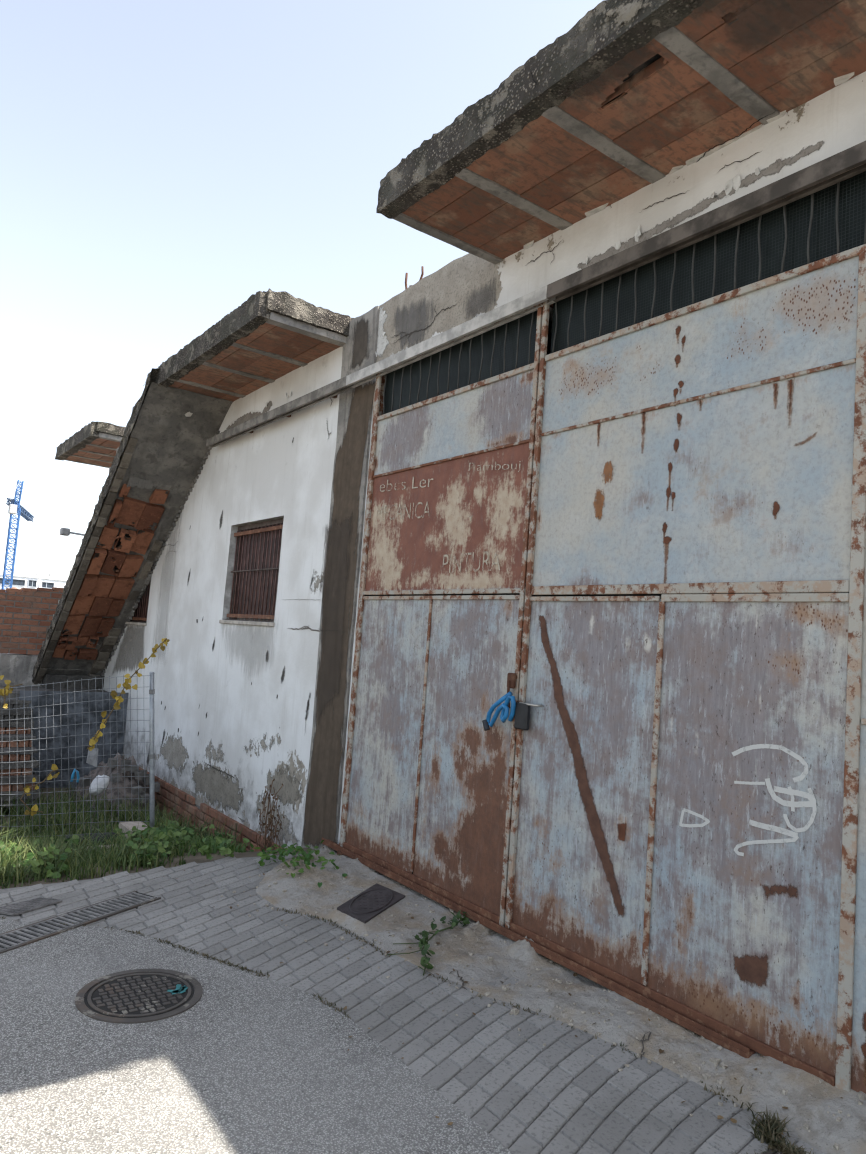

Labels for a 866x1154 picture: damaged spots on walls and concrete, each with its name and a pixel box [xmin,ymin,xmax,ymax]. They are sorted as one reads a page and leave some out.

peeling [578,141,824,269]
corrosion [675,326,685,368]
corrosion [662,381,684,584]
peeling [160,727,305,847]
corrosion [539,615,626,917]
corrosion [763,884,798,899]
corrosion [733,954,768,987]